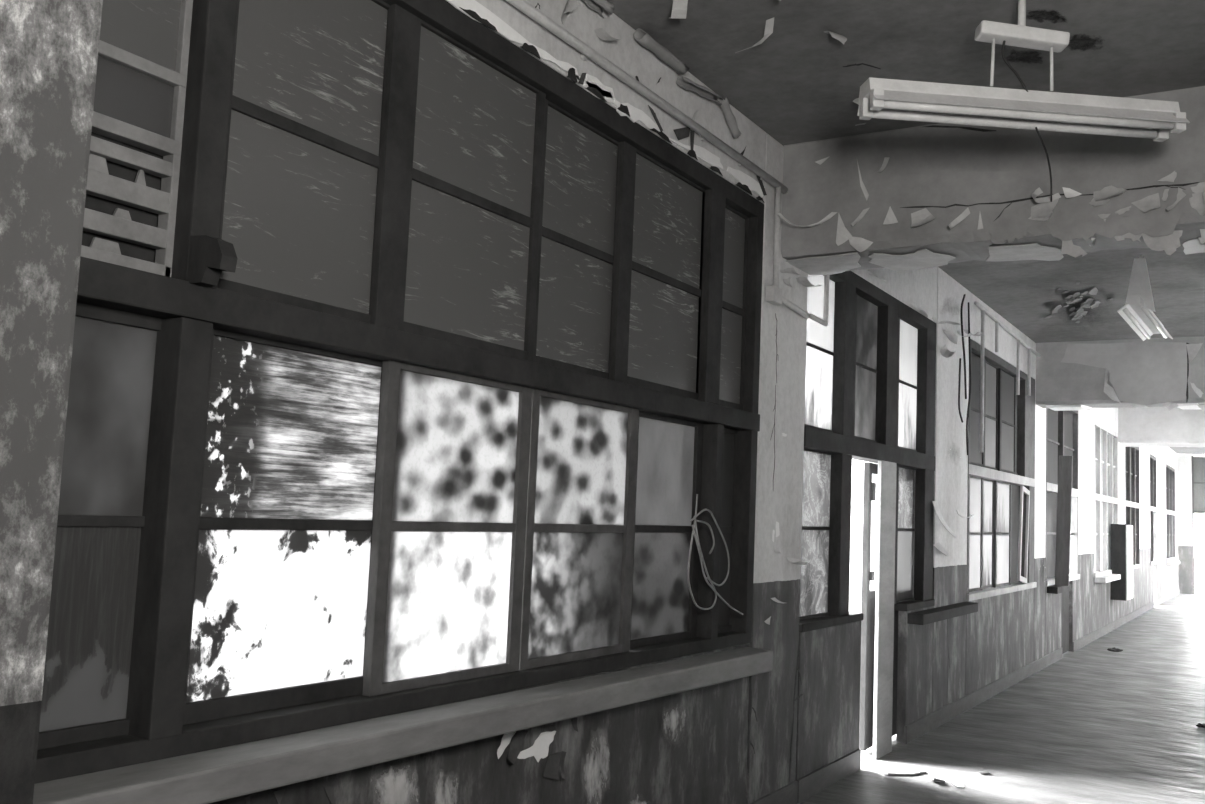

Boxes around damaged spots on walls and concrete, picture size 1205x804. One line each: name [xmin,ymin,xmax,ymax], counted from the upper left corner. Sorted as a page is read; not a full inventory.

peeling [824,31,847,44]
flaking render [446,0,767,202]
crack [1126,182,1199,190]
spalling [777,161,955,287]
crack [901,194,1093,222]
peeling [948,171,1205,262]
peeling [1044,281,1113,323]
water stain [376,768,418,804]
water stain [435,772,457,804]
water stain [585,736,609,797]